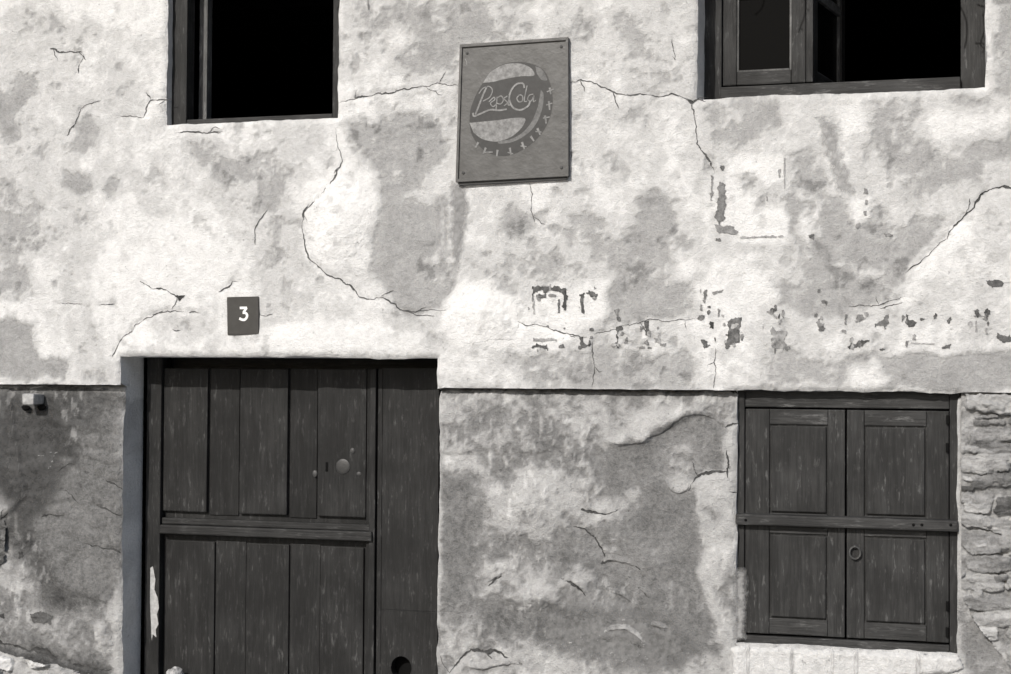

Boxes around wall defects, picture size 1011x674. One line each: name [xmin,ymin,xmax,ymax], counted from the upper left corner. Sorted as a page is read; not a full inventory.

crack [340,73,456,103]
crack [570,79,714,169]
crack [302,135,444,316]
water stain [437,184,468,268]
peeling [710,165,784,241]
crack [907,185,1011,272]
crack [112,281,198,356]
peeling [531,325,565,352]
peeling [697,289,744,349]
peeling [841,312,889,350]
spalling [968,308,1011,343]
crack [689,423,739,493]